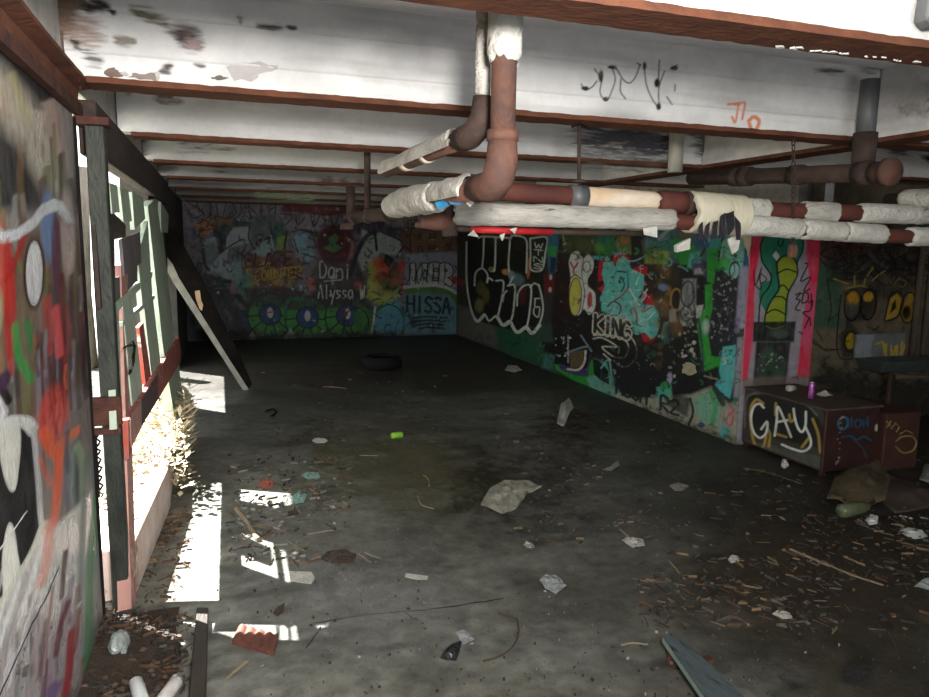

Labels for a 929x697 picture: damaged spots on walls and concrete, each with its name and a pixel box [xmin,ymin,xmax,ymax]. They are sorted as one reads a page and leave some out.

peeling [776,45,849,55]
peeling [104,67,161,81]
spalling [211,61,278,82]